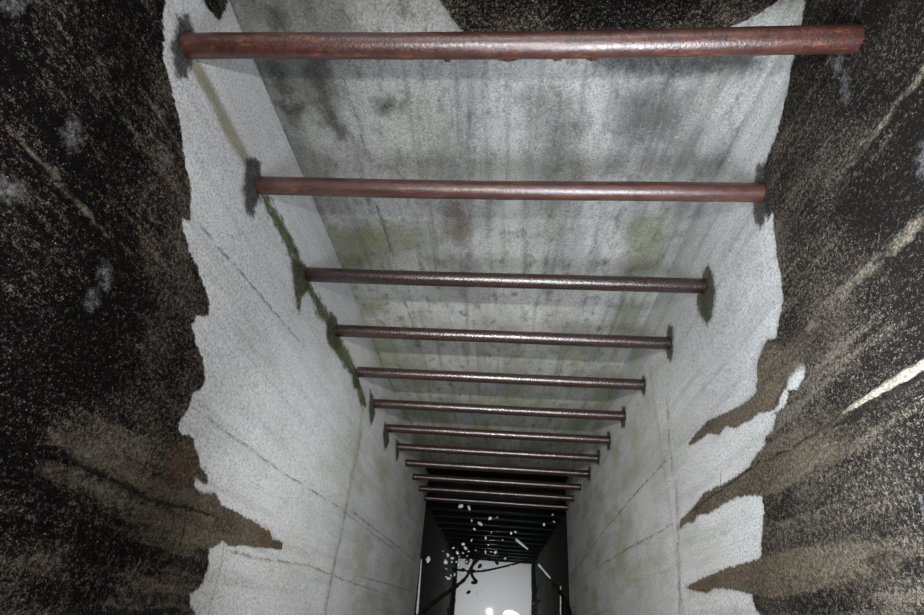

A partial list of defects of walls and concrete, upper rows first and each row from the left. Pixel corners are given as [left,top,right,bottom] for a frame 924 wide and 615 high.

leakage [598,56,752,75]
leakage [292,259,310,310]
leakage [696,266,715,327]